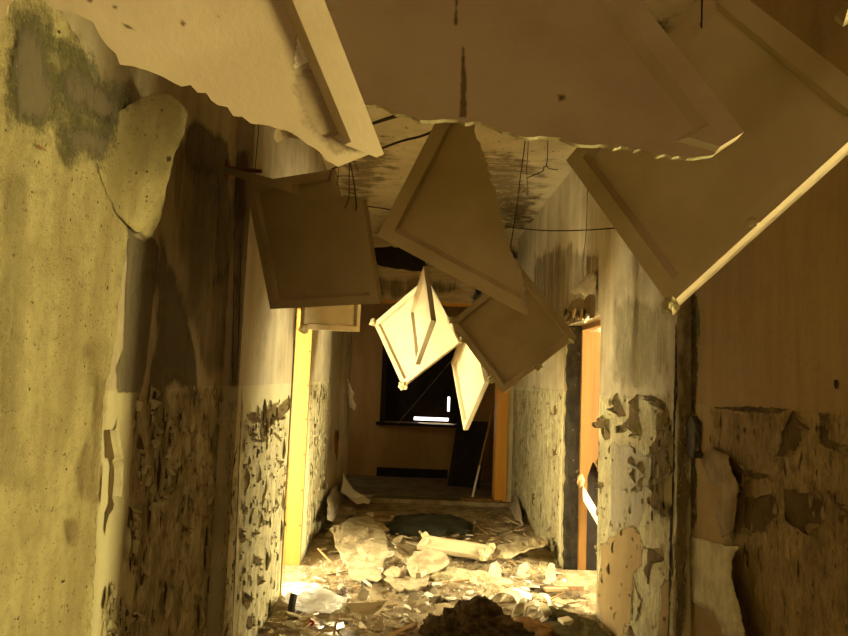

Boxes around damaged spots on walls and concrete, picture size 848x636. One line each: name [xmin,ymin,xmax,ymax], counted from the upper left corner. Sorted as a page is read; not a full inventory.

water stain [7,5,132,170]
water stain [342,136,398,201]
water stain [484,152,544,229]
peeling [101,380,291,636]
peeling [307,379,341,546]
peeling [592,393,689,554]
peeling [619,406,848,636]